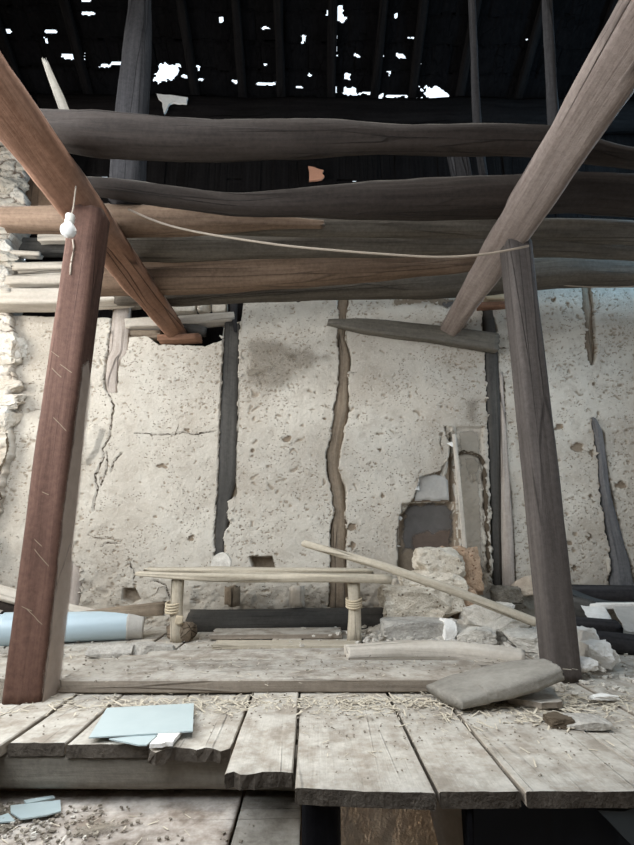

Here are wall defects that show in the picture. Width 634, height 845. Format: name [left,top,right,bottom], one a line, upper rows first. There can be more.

crack [94,394,122,510]
flaking render [397,431,502,585]